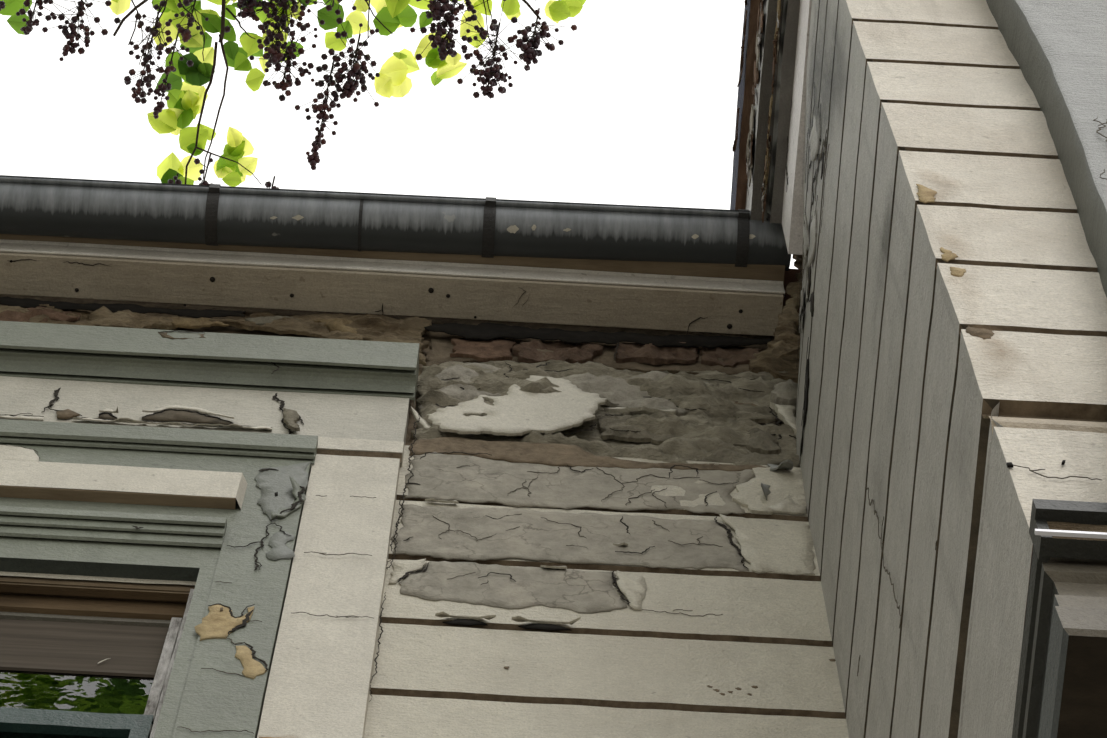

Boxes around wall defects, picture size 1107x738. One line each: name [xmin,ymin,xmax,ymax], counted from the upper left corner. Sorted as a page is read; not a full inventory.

peeling [732,0,781,223]
crack [1093,117,1107,142]
flaking render [0,83,829,613]
peeling [195,603,268,679]
crack [227,403,420,702]
crack [642,608,723,616]
crack [866,487,902,629]